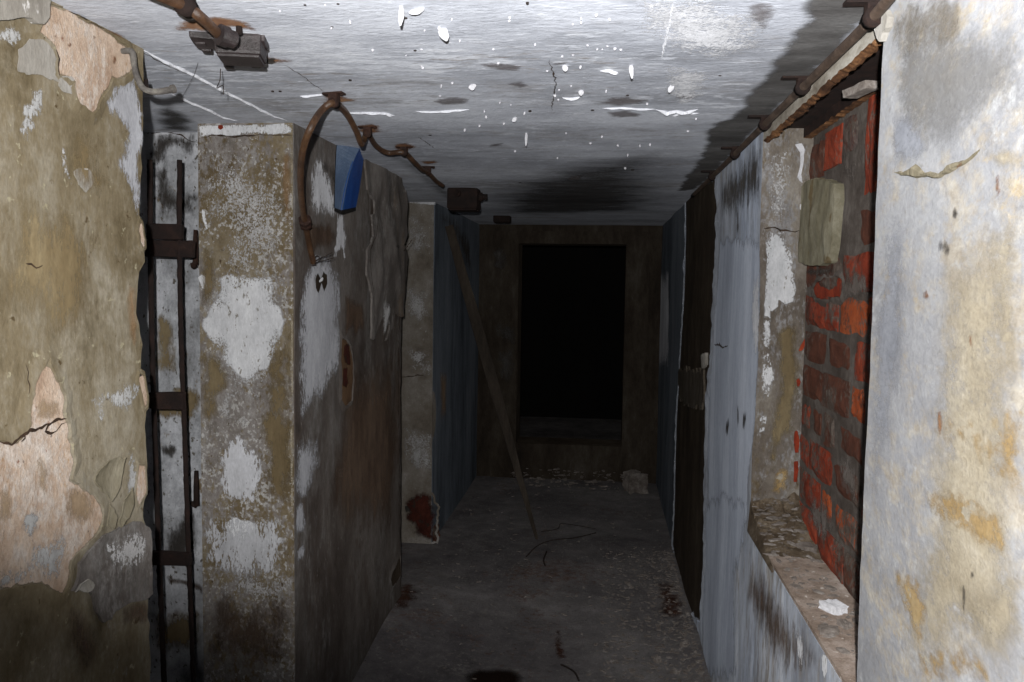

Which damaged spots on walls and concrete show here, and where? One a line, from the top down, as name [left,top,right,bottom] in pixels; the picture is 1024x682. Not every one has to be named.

spalling [0,0,138,126]
rust [178,17,254,30]
damp [898,2,1010,127]
damp [203,249,214,300]
crack [0,418,67,446]
spalling [0,344,153,623]
damp [263,336,292,500]